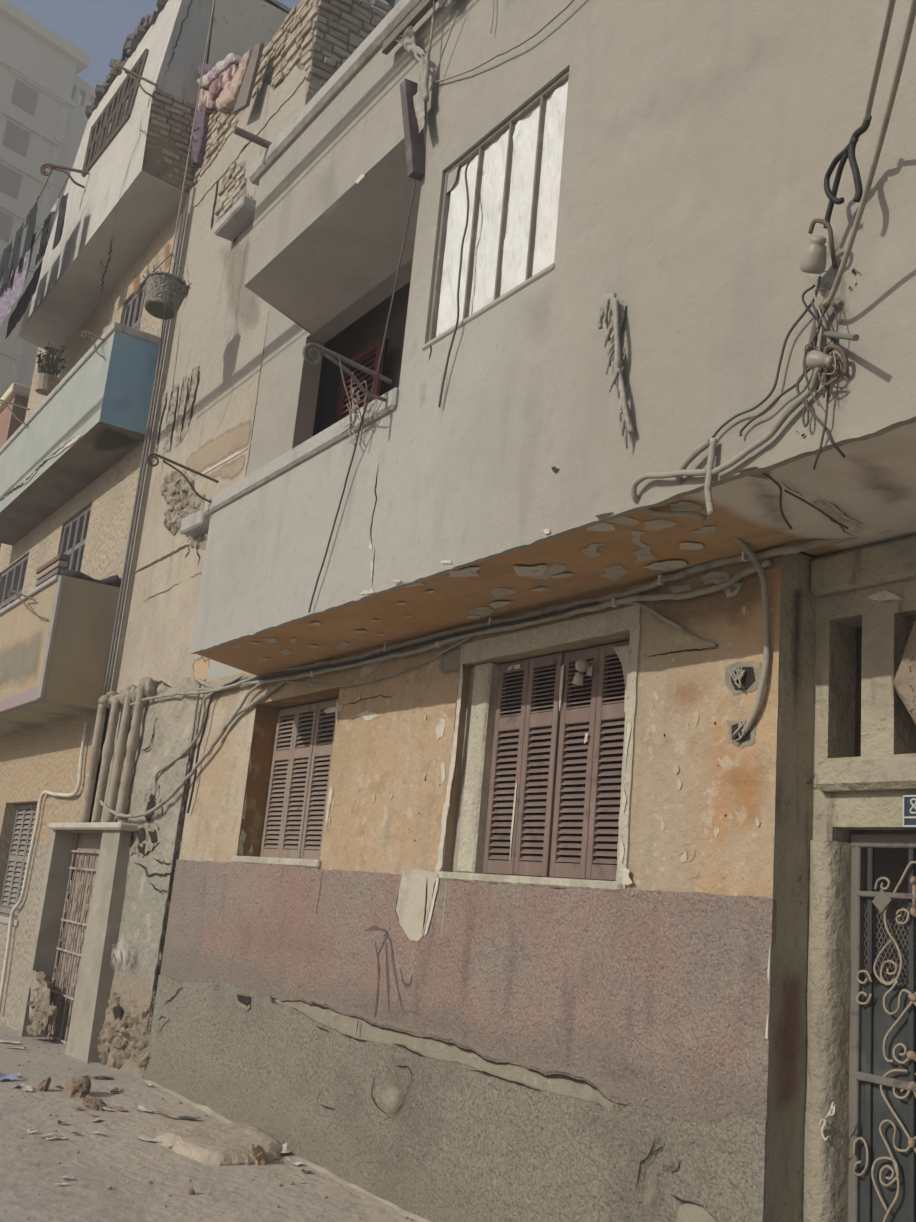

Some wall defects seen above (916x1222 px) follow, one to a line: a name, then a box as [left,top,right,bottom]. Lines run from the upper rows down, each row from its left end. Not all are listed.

crack [165,0,193,73]
spalling [160,469,210,568]
crack [369,463,379,579]
peeling [582,501,717,581]
peeling [467,564,574,619]
peeling [324,694,382,724]
spalling [129,784,162,857]
peeling [395,658,463,942]
spalling [26,970,58,1039]
spalling [97,991,151,1069]